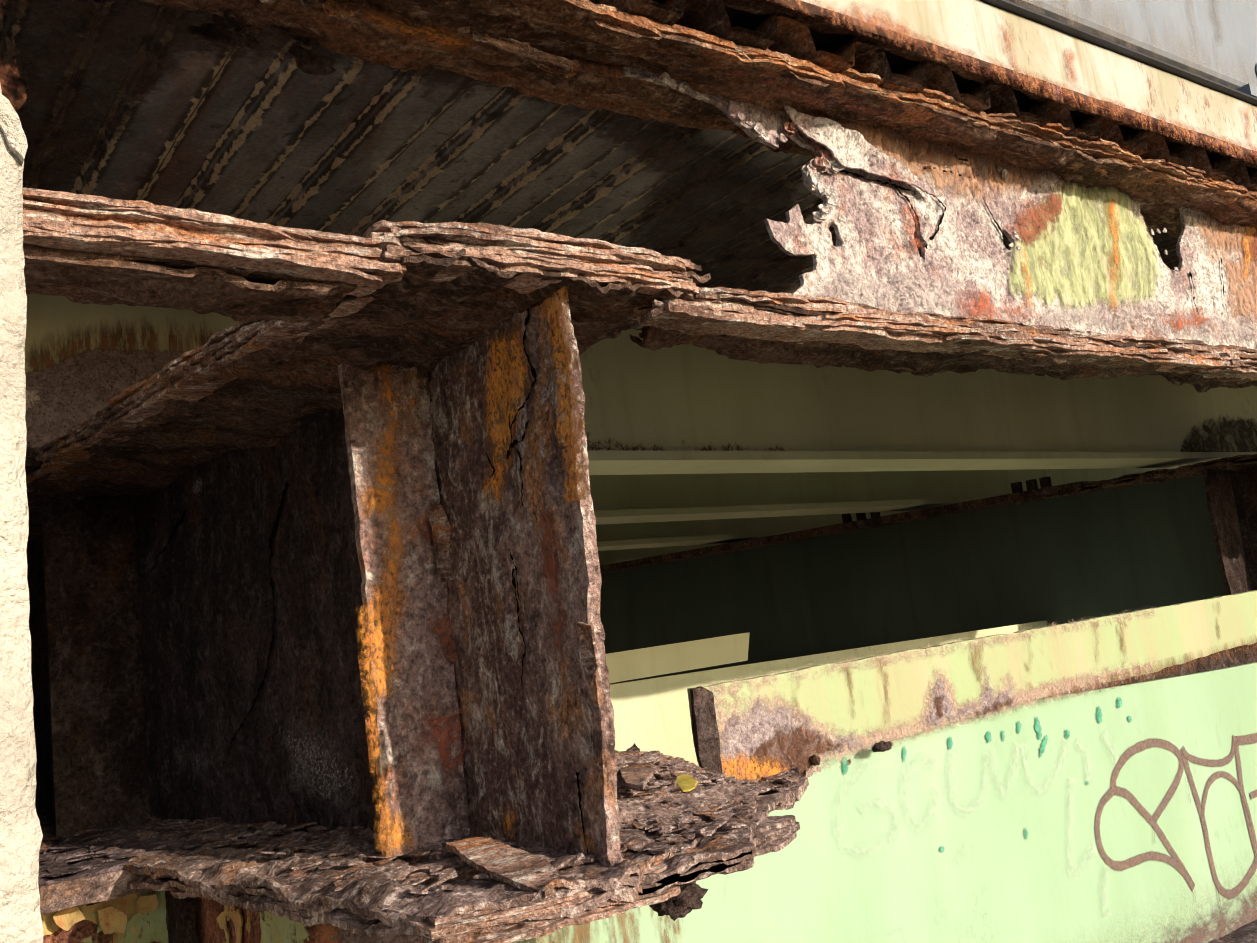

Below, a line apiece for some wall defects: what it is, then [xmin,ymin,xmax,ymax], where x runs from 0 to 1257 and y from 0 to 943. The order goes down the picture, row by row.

rust [0,0,1257,503]
crack [824,154,1008,249]
peeling [1009,182,1180,309]
crack [1189,253,1230,324]
crack [486,309,537,506]
rust [360,363,415,757]
rust [536,503,599,675]
rust [690,630,1229,781]
rust [753,815,800,857]
peeling [41,890,168,943]
peeling [216,905,310,943]
rust [314,879,680,943]